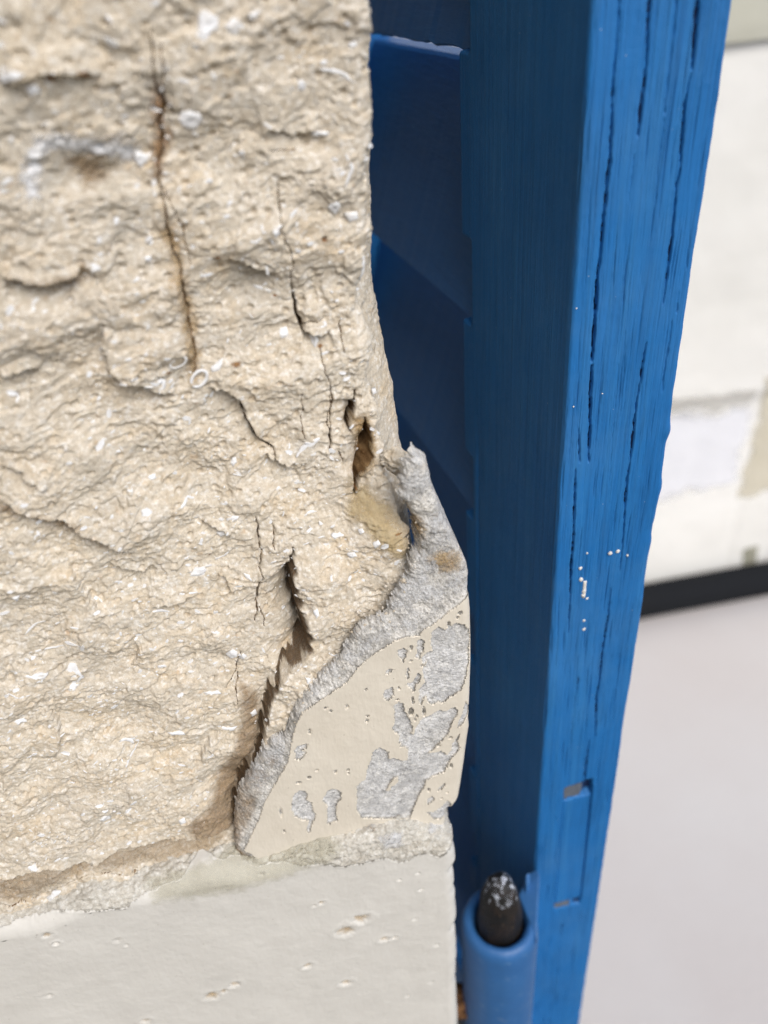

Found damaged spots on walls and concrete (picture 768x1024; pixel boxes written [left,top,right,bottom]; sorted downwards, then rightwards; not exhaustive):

rust [154,95,167,164]
crack [150,30,196,370]
spalling [0,0,412,914]
crack [235,398,275,461]
crack [277,181,373,492]
crack [568,482,576,592]
crack [578,90,613,454]
crack [623,421,634,525]
crack [637,1,650,130]
crack [690,1,698,58]
crack [228,516,313,822]
peeling [357,611,469,818]